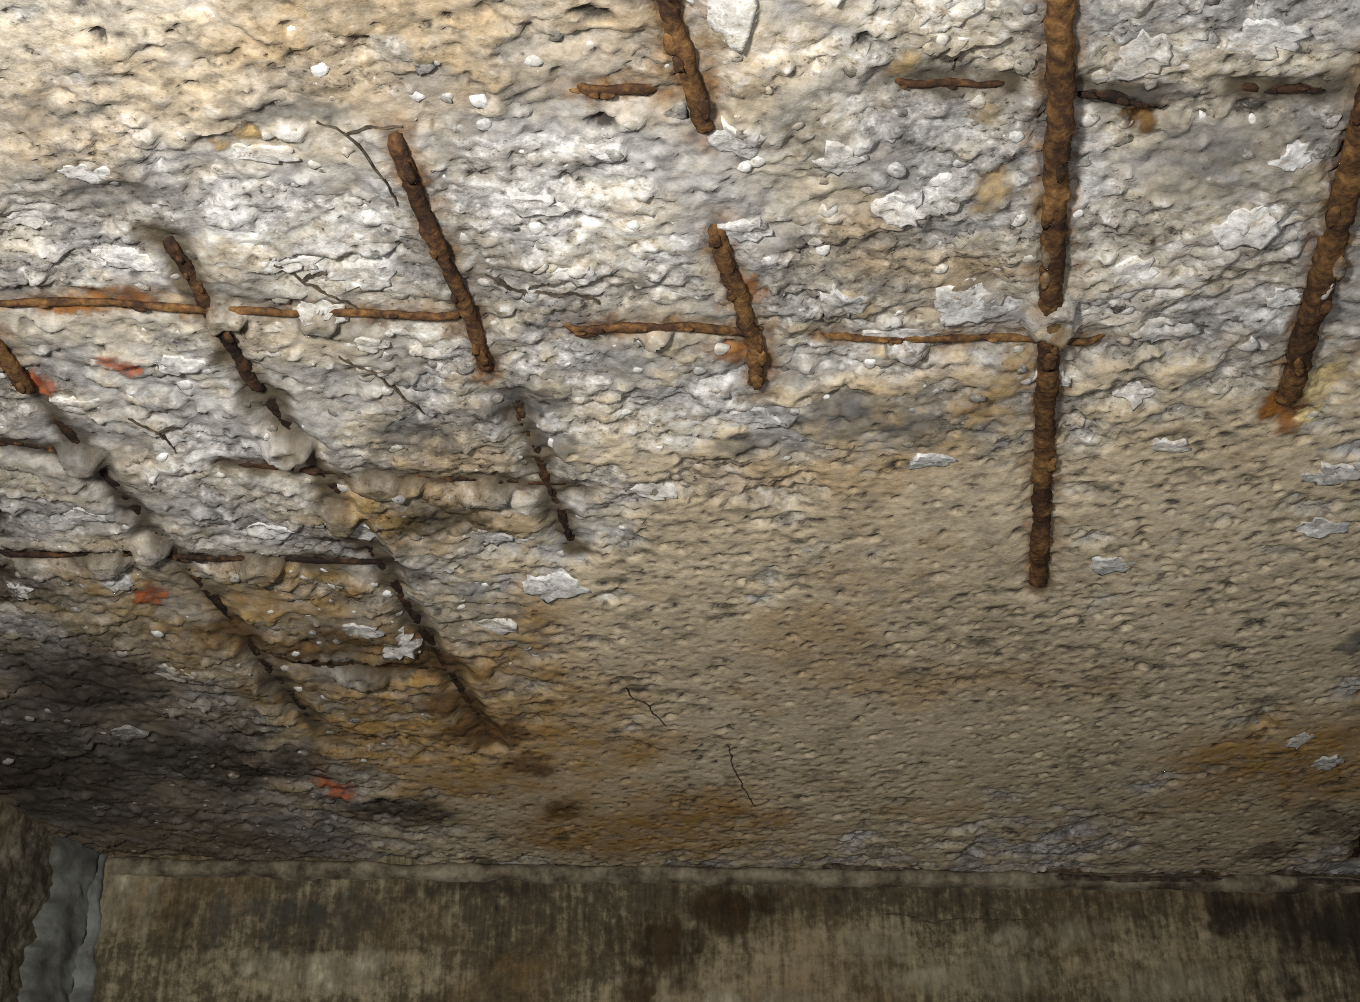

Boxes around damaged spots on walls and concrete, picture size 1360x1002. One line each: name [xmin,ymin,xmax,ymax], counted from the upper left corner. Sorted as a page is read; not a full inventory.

corrosion [1121,105,1158,133]
corrosion [46,286,152,314]
spalling [414,0,1360,587]
corrosion [24,369,54,395]
corrosion [1259,391,1305,432]
spalling [0,35,678,859]
damp [0,739,119,801]
damp [155,721,323,790]
spalling [1310,754,1344,770]
damp [335,799,445,828]
spalling [953,815,1127,873]
damp [621,890,775,1002]